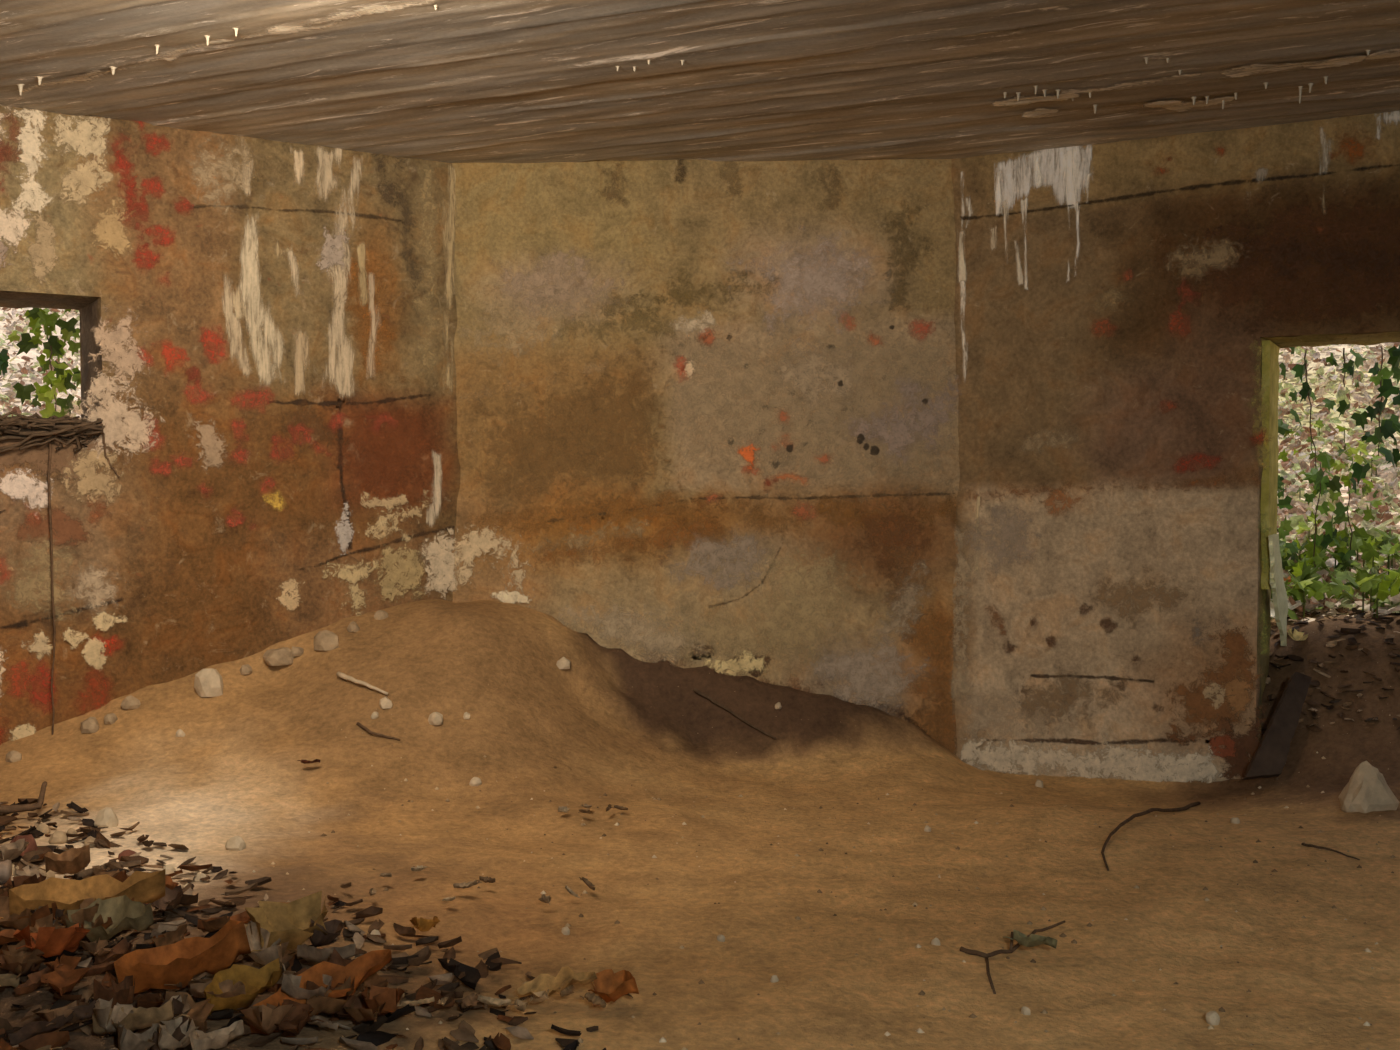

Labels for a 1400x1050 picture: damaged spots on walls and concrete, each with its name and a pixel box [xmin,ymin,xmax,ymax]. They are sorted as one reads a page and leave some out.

water stain [993,74,1200,119]
water stain [1145,97,1235,112]
water stain [1220,49,1400,77]
water stain [1377,111,1400,139]
water stain [991,145,1092,289]
crack [961,164,1398,220]
water stain [223,218,308,397]
water stain [294,146,929,396]
water stain [358,452,442,542]
water stain [454,352,669,607]